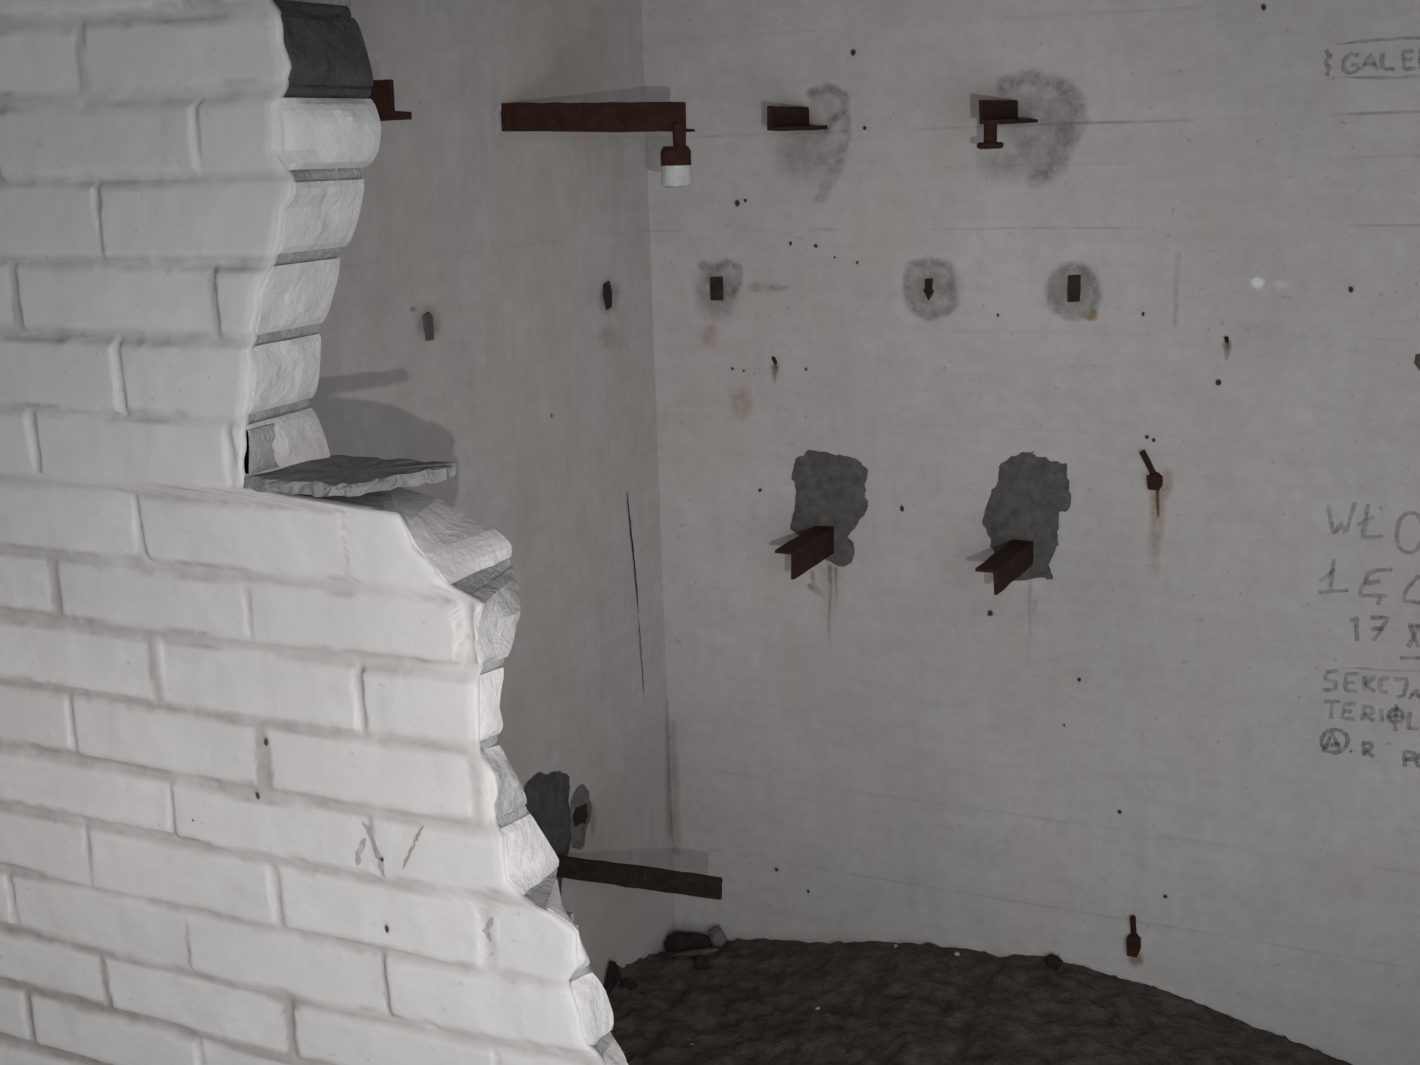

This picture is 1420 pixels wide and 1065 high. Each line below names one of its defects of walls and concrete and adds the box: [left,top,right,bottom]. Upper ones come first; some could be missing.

spalling [243,0,629,1065]